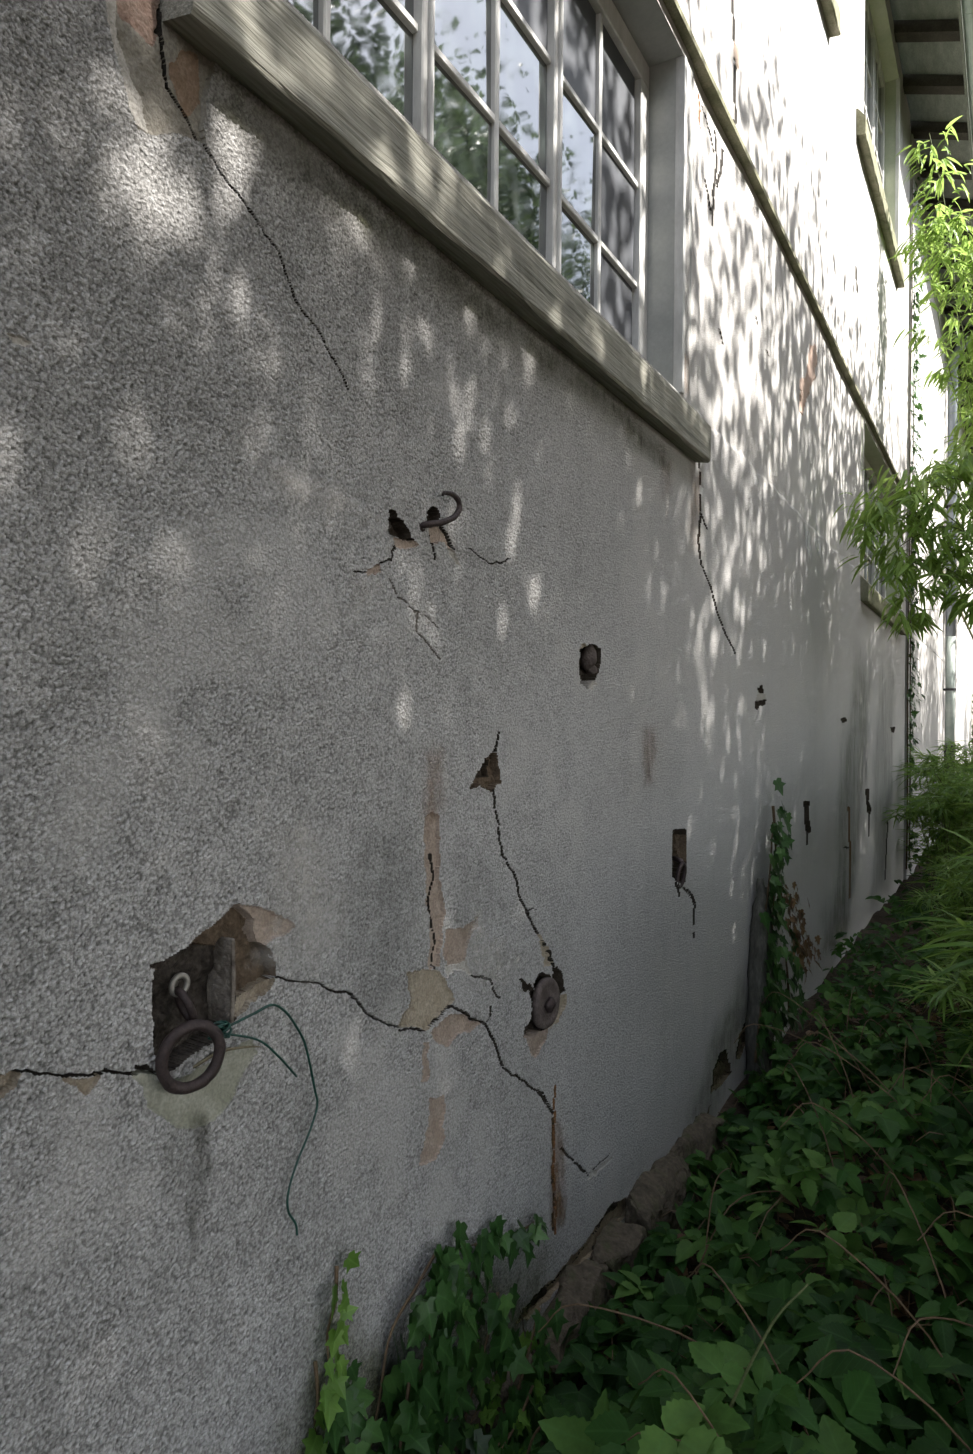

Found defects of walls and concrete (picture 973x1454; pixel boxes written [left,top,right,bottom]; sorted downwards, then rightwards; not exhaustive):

spalling [105,0,215,143]
crack [153,5,349,390]
crack [697,0,739,227]
peeling [799,343,817,415]
crack [697,463,736,654]
spalling [179,903,296,1018]
peeling [398,811,481,1166]
crack [492,789,555,969]
spalling [0,1071,22,1100]
crack [11,1064,157,1096]
crack [261,975,612,1235]
spalling [516,1197,627,1324]